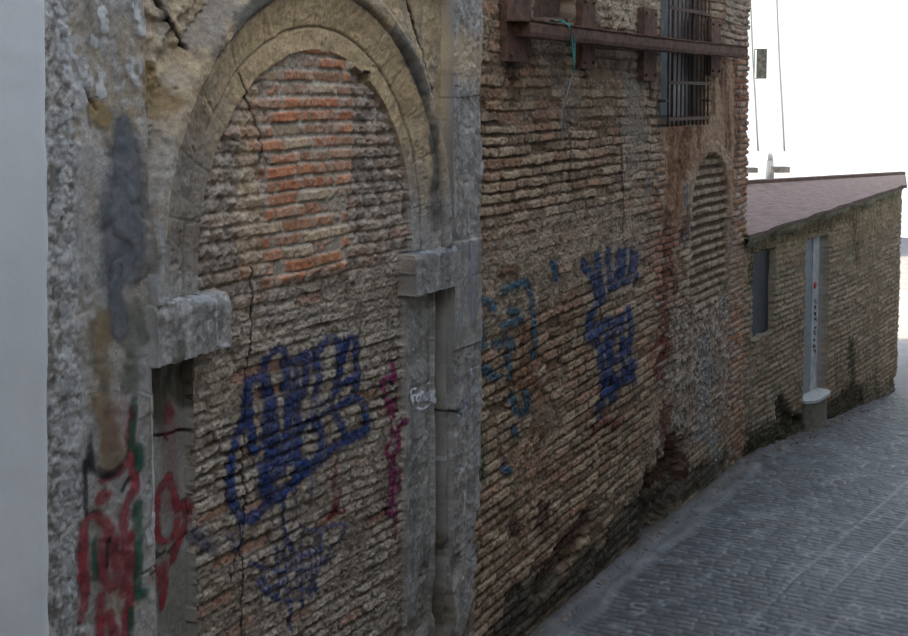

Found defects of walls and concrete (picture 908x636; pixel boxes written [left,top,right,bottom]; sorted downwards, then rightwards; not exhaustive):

crack [153,0,187,50]
crack [243,267,254,394]
damp [827,340,864,419]
damp [741,399,805,457]
crack [230,431,255,636]